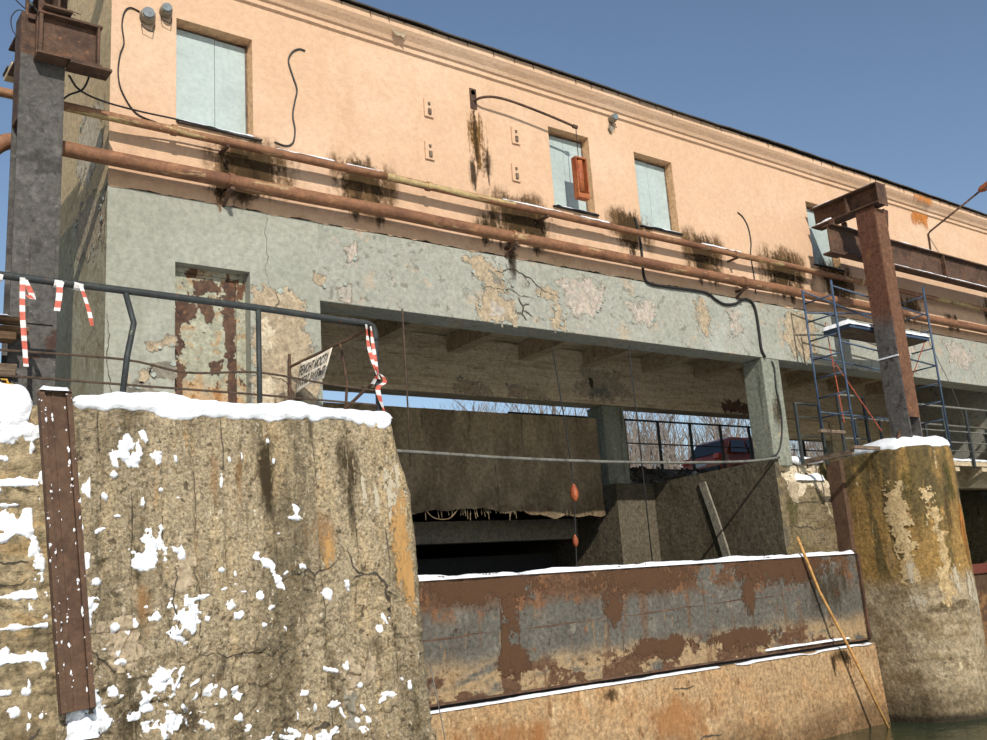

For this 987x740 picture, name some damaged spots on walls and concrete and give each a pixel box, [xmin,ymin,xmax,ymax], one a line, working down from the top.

water stain [209,138,292,186]
water stain [332,155,396,206]
water stain [477,191,546,276]
peeling [461,251,521,328]
crack [484,264,546,320]
peeling [534,273,608,333]
water stain [758,247,855,307]
peeling [249,283,322,405]
spalling [882,480,962,607]
crack [172,566,292,675]
crack [291,548,396,617]
rust [419,556,833,681]